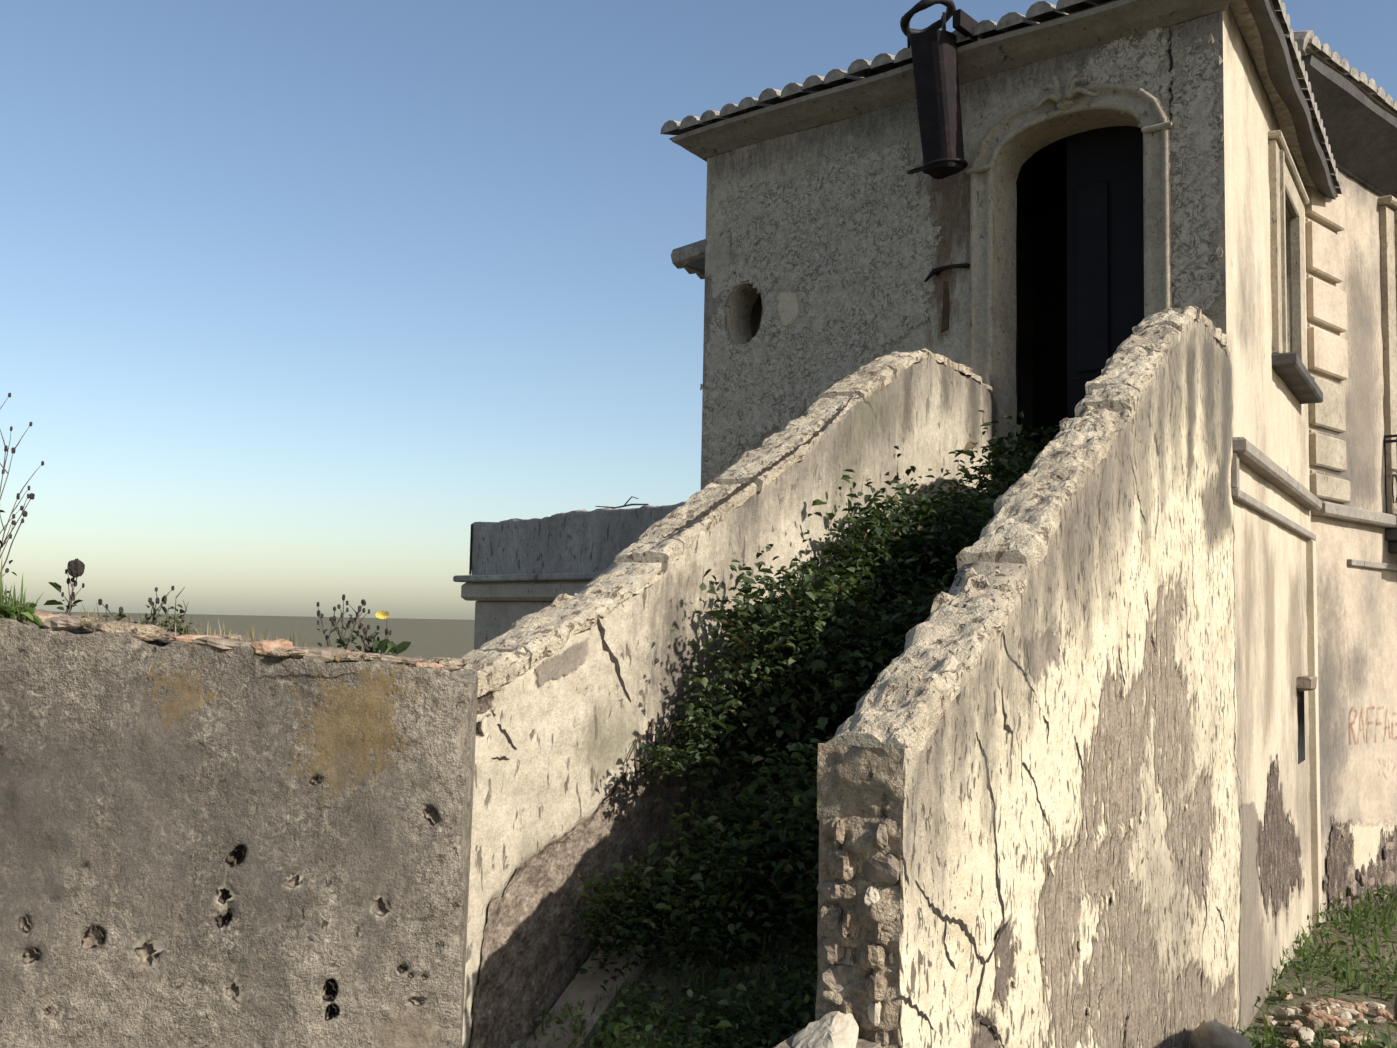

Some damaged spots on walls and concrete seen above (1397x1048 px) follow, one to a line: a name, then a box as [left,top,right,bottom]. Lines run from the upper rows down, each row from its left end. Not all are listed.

spalling [469,725,738,1048]
crack [597,619,631,702]
crack [899,632,1086,1048]
peeling [971,570,1237,1048]
spalling [1256,754,1305,933]
spalling [1324,815,1397,921]